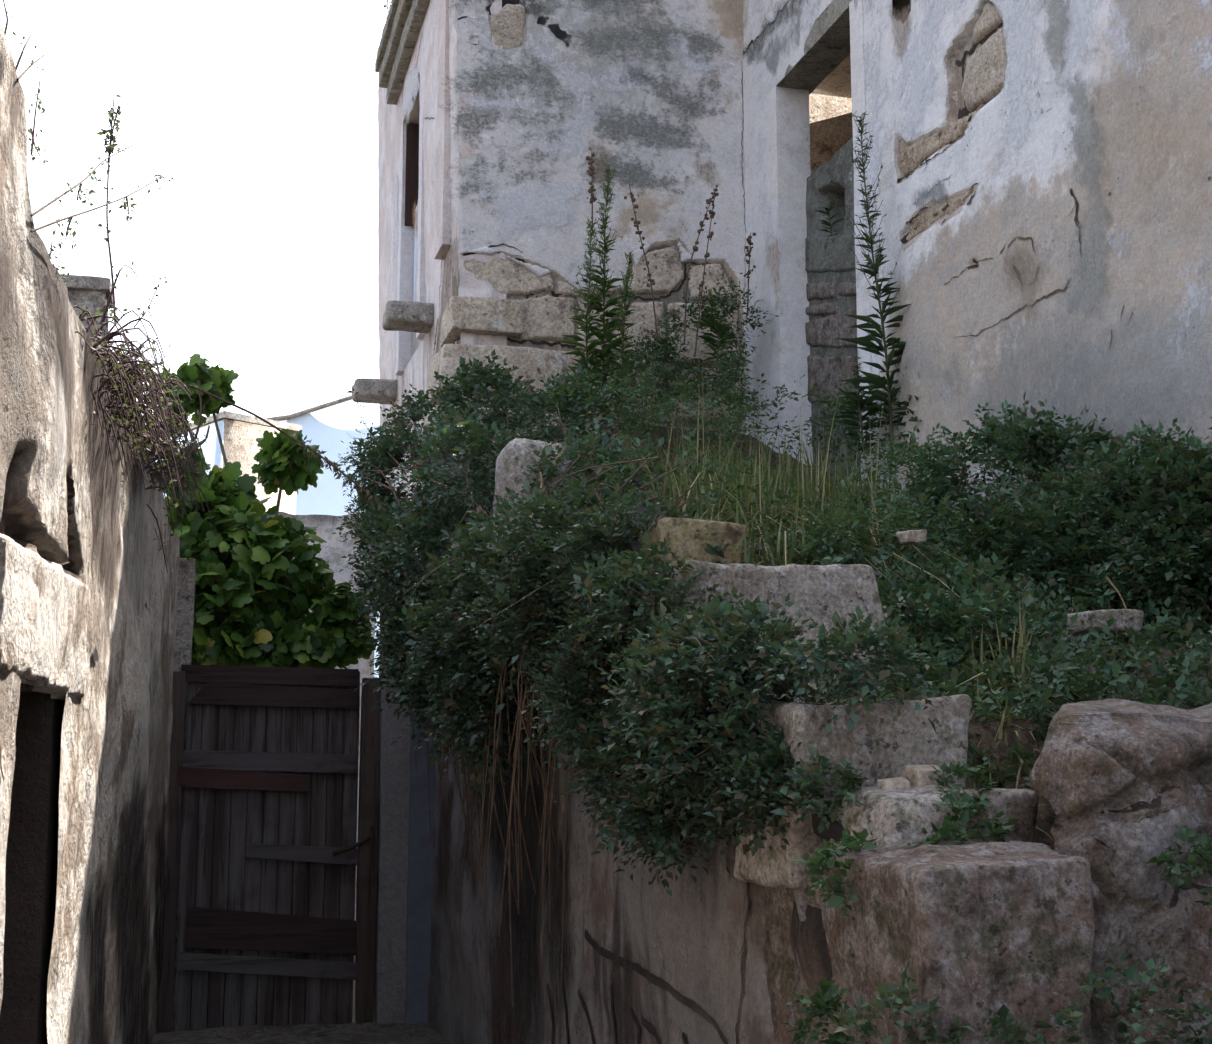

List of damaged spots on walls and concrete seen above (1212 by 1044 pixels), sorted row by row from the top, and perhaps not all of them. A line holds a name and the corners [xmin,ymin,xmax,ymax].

peeling [466,94,535,116]
damp [446,50,576,202]
spalling [486,0,640,163]
damp [541,0,724,197]
spalling [424,182,742,440]
crack [944,258,993,285]
crack [955,188,1082,338]
damp [86,777,166,1044]